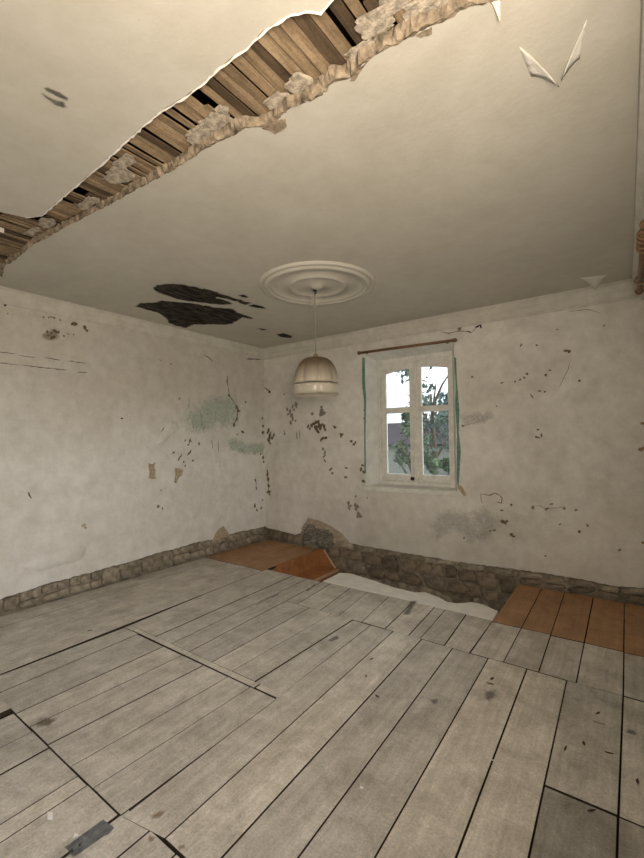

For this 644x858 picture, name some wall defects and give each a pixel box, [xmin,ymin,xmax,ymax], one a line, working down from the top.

peeling [519,20,587,87]
spalling [0,0,501,277]
crack [226,376,246,433]
peeling [284,402,356,475]
flaking render [0,518,644,613]